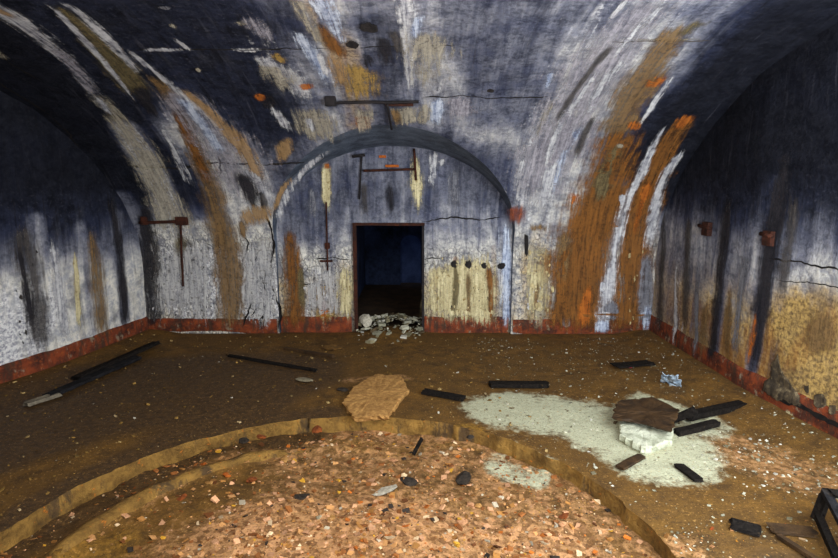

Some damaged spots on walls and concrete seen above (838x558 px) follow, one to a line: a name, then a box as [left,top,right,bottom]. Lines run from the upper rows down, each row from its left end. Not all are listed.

corrosion [328,57,379,97]
corrosion [356,110,373,131]
corrosion [150,78,247,328]
corrosion [283,233,305,326]
corrosion [531,22,701,332]
leakage [638,152,683,328]
leakage [672,156,798,365]
crack [774,258,838,288]
leakage [808,313,836,354]